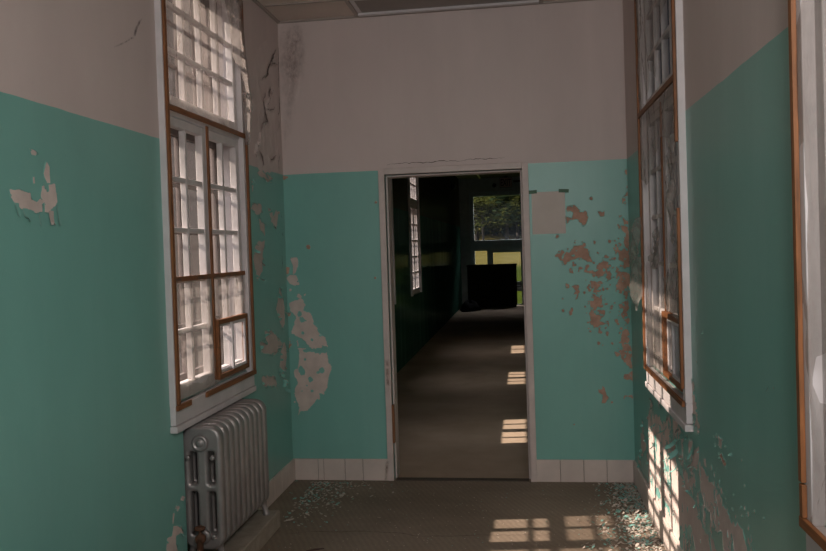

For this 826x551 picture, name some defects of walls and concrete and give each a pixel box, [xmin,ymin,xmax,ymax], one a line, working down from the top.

peeling [9,161,62,226]
peeling [566,204,605,227]
peeling [259,257,332,415]
peeling [554,215,633,382]
peeling [577,482,665,551]
peeling [637,378,765,551]